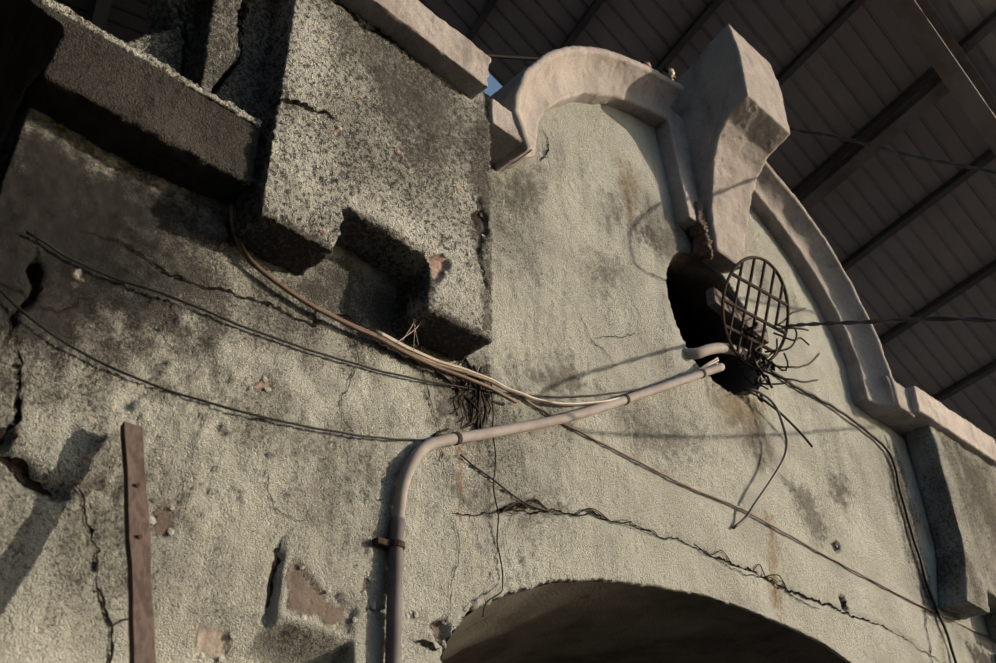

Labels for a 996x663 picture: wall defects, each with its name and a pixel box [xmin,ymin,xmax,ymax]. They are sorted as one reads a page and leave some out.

crack [211,1,249,95]
crack [258,98,343,123]
spalling [427,253,449,281]
crack [79,231,359,429]
crack [0,228,96,497]
leakage [784,481,829,541]
crack [73,483,128,663]
spalling [287,565,386,629]
crack [415,500,938,662]
peeling [196,627,236,662]
spalling [430,620,446,649]
leakage [965,641,996,663]